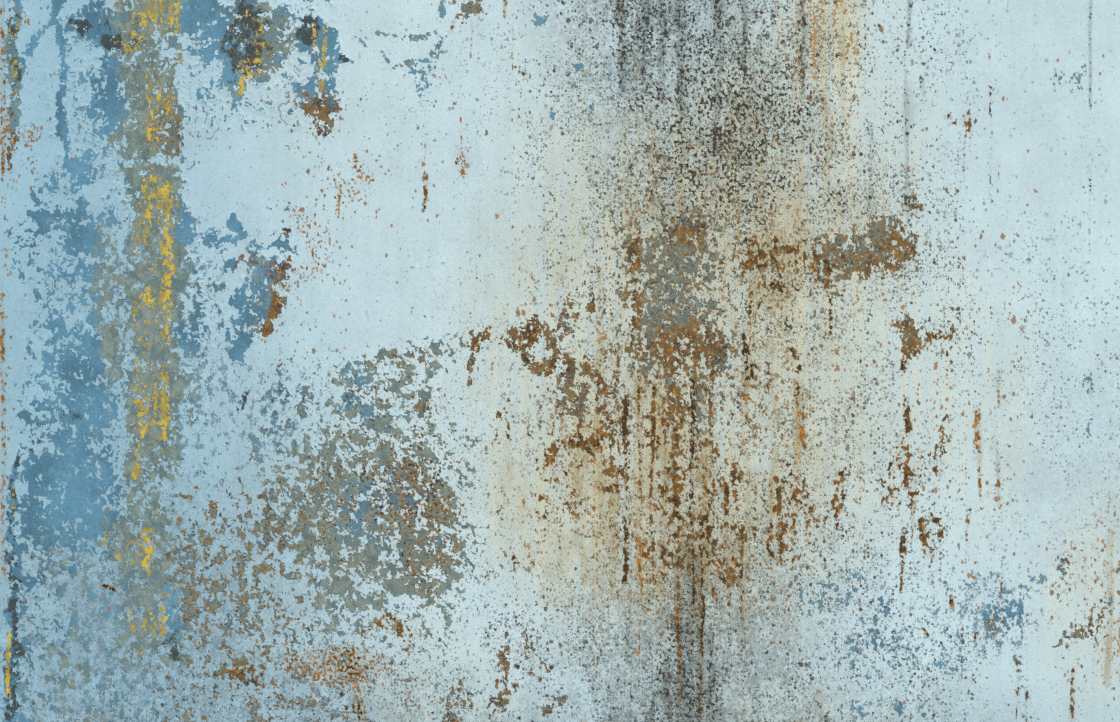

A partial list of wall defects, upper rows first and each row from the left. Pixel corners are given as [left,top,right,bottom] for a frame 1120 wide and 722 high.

peeling [0,0,749,722]
damp [590,0,878,261]
damp [754,250,833,354]
peeling [727,208,920,302]
peeling [885,314,926,360]
peeling [902,193,923,217]
corrosion [923,320,955,350]
corrosion [241,223,927,721]
corrosion [874,397,953,605]
damp [594,539,783,722]